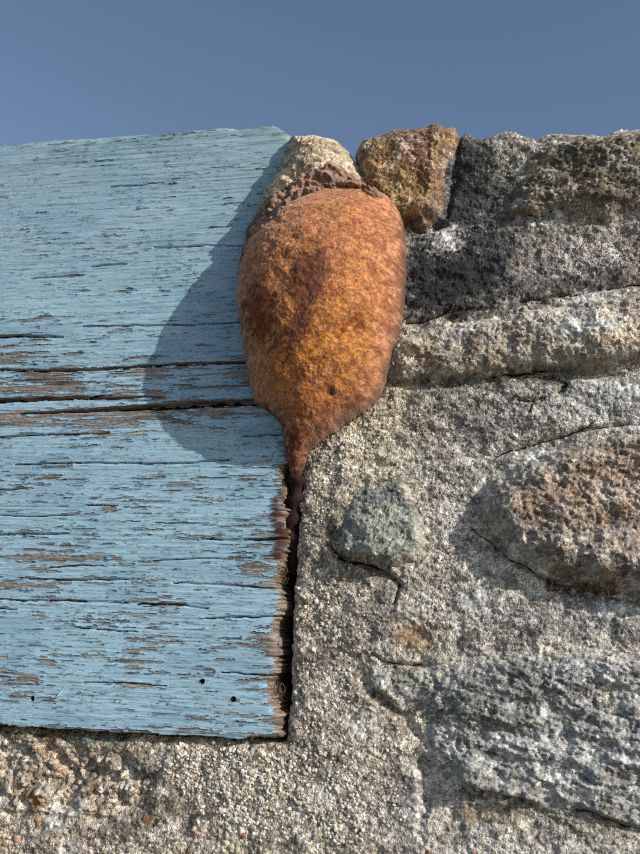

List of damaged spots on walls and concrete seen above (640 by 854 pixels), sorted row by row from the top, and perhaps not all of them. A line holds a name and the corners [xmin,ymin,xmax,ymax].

water stain [404,231,513,317]
rust [268,247,332,362]
peeling [0,354,248,434]
crack [495,424,629,458]
peeling [79,494,159,514]
peeling [0,581,54,591]
peeling [0,552,117,563]
crack [330,545,401,603]
crack [471,528,549,582]
peeling [222,634,281,648]
peeling [5,672,45,684]
peeling [104,659,169,689]